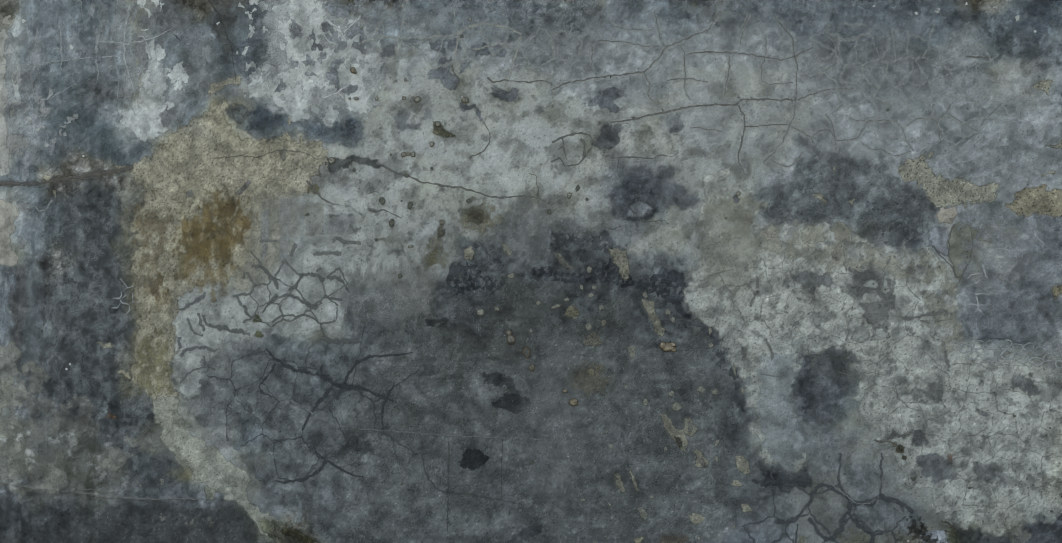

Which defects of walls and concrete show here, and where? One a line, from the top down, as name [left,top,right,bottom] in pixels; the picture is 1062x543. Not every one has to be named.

peeling [0,341,93,500]
spalling [99,0,385,536]
leakage [183,197,812,543]
crack [170,0,998,523]
leakage [172,0,1062,297]
leakage [790,269,911,426]
flaking render [683,168,1062,543]
crack [701,225,1053,543]
spalling [898,151,1062,219]
leakage [959,207,1062,396]